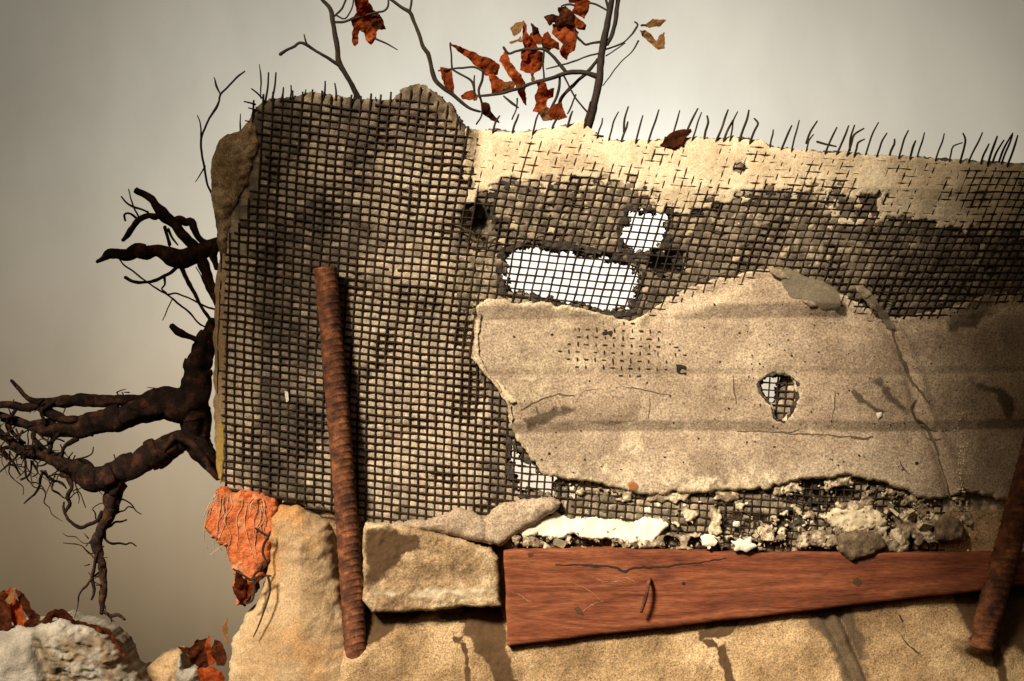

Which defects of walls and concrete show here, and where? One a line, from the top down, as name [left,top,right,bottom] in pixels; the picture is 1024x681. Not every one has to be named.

spalling [386,84,460,132]
spalling [204,119,282,607]
spalling [314,266,367,659]
spalling [505,434,848,546]
spalling [451,178,1024,423]
crack [891,329,950,498]